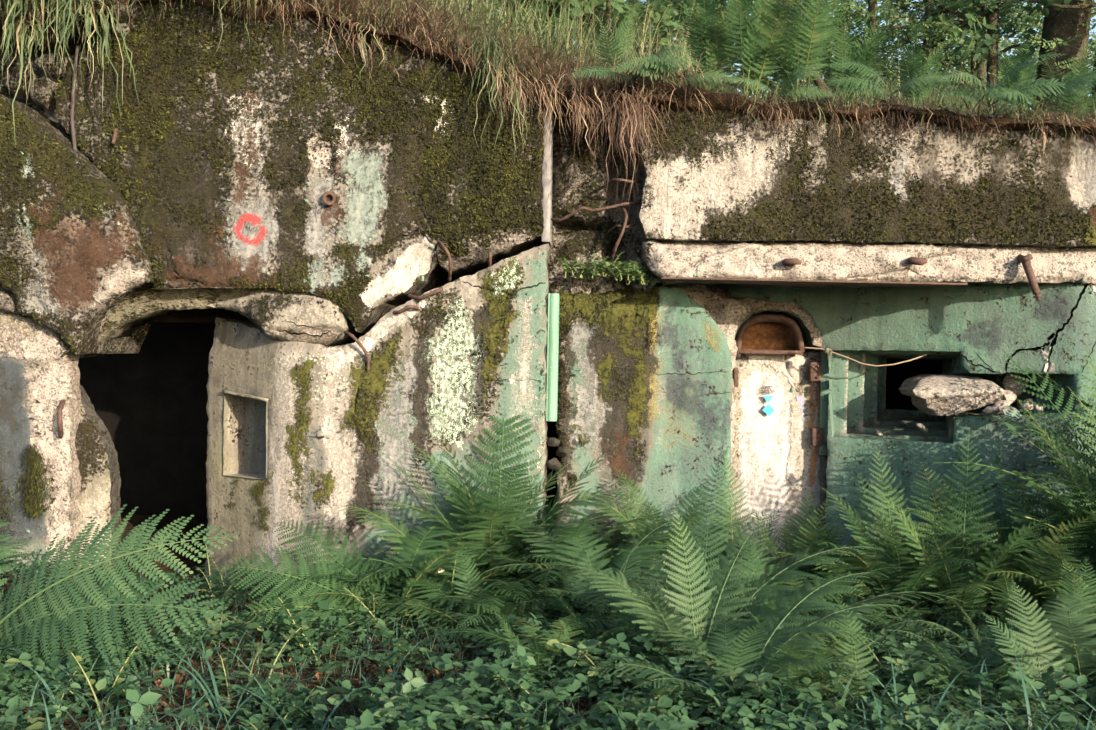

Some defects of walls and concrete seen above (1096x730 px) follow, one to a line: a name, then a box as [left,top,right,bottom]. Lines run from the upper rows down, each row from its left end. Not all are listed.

corrosion [320,188,342,226]
crack [371,229,475,262]
crack [464,282,543,295]
crack [961,286,1088,373]
water stain [557,319,660,500]
spalling [641,240,1096,564]